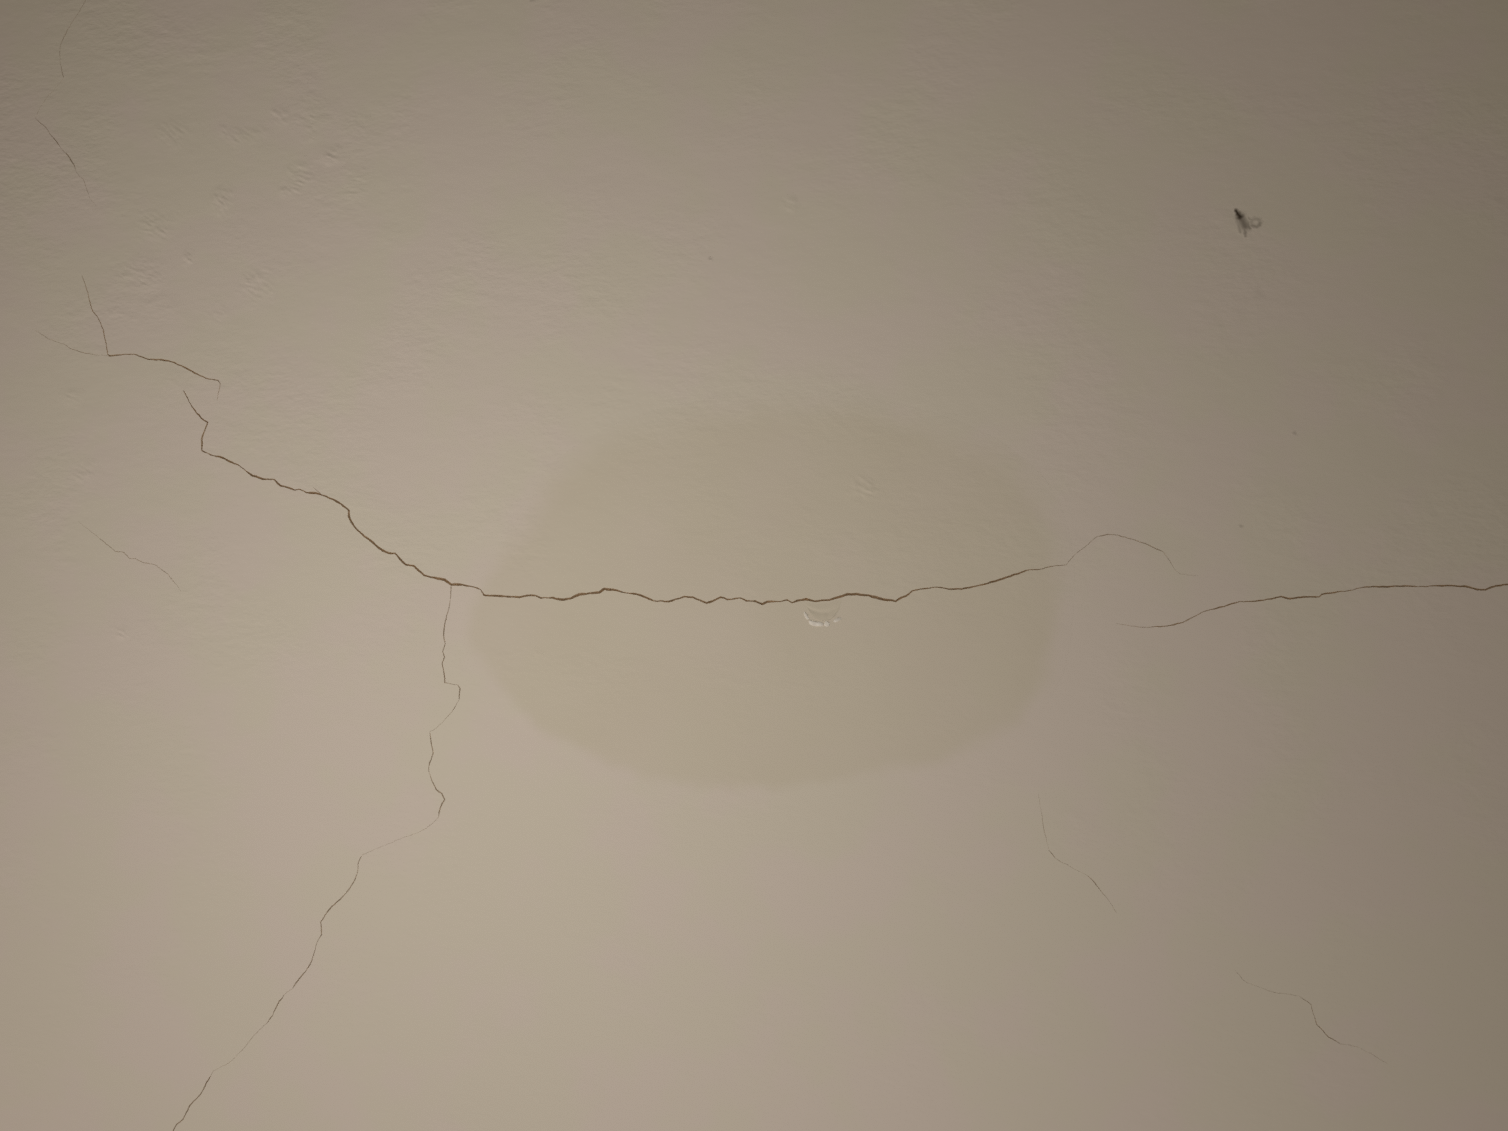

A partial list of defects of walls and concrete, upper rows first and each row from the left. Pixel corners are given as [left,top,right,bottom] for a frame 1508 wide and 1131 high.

crack [33,277,1196,1131]
leakage [456,393,1075,803]
crack [1116,584,1508,628]